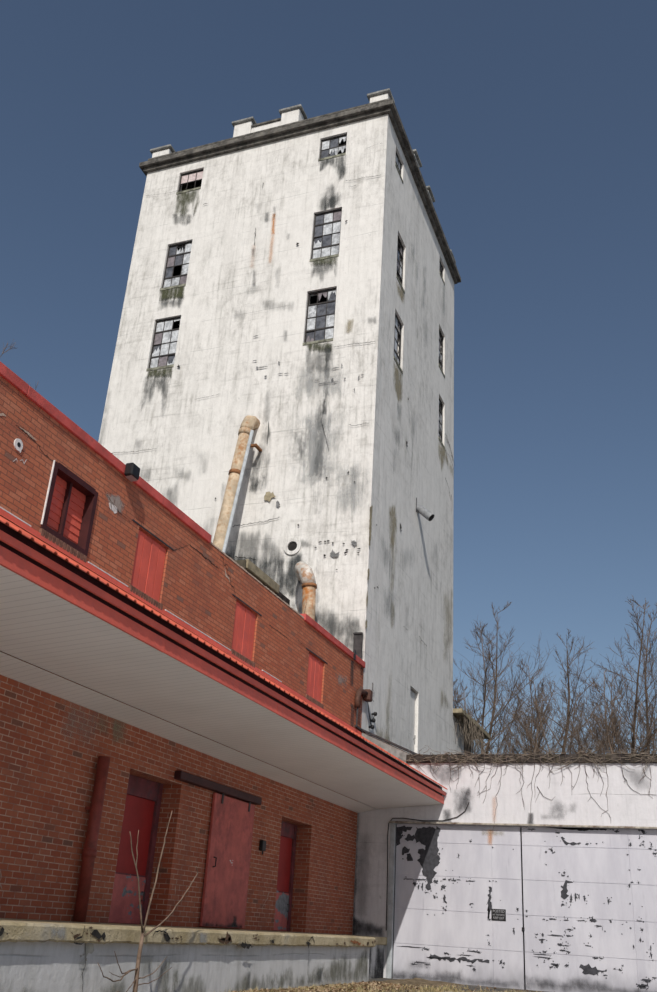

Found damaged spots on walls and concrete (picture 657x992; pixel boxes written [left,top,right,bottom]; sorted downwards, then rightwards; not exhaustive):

leakage [320,156,345,178]
leakage [175,191,196,223]
leakage [307,343,332,375]
crack [0,413,53,461]
leakage [301,401,331,476]
crack [174,544,256,591]
leakage [229,554,301,595]
peeling [547,827,619,846]
peeling [396,825,474,916]
peeling [486,880,501,921]
peeling [532,871,654,979]
peeling [399,935,505,971]